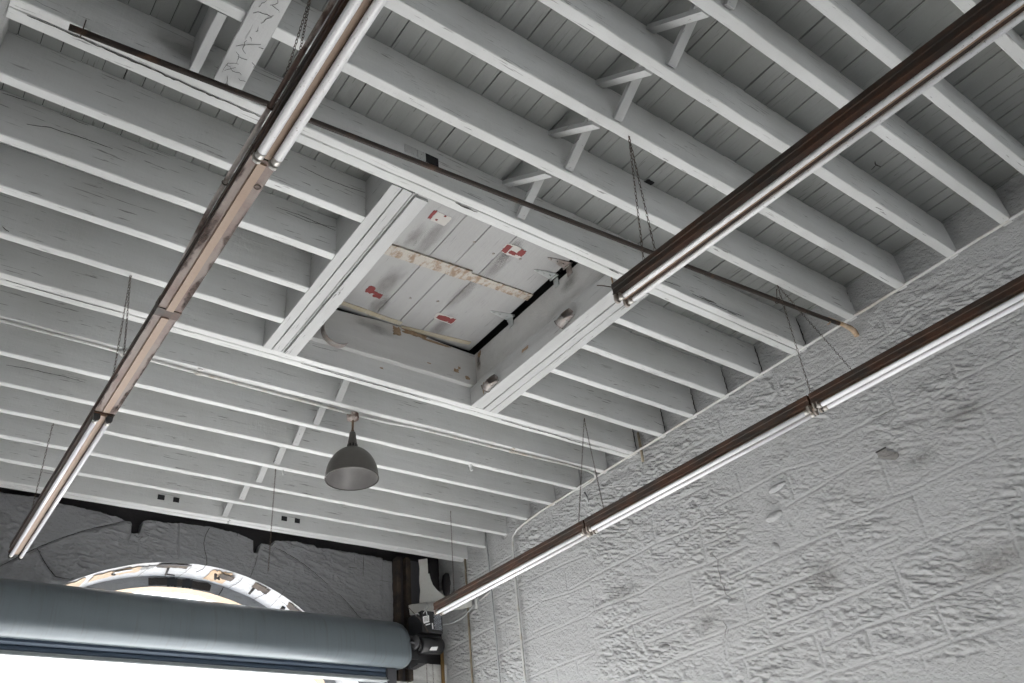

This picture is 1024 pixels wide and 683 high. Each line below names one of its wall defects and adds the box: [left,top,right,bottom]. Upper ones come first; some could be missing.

crack [27,0,279,117]
peeling [502,245,527,257]
spalling [876,447,899,460]